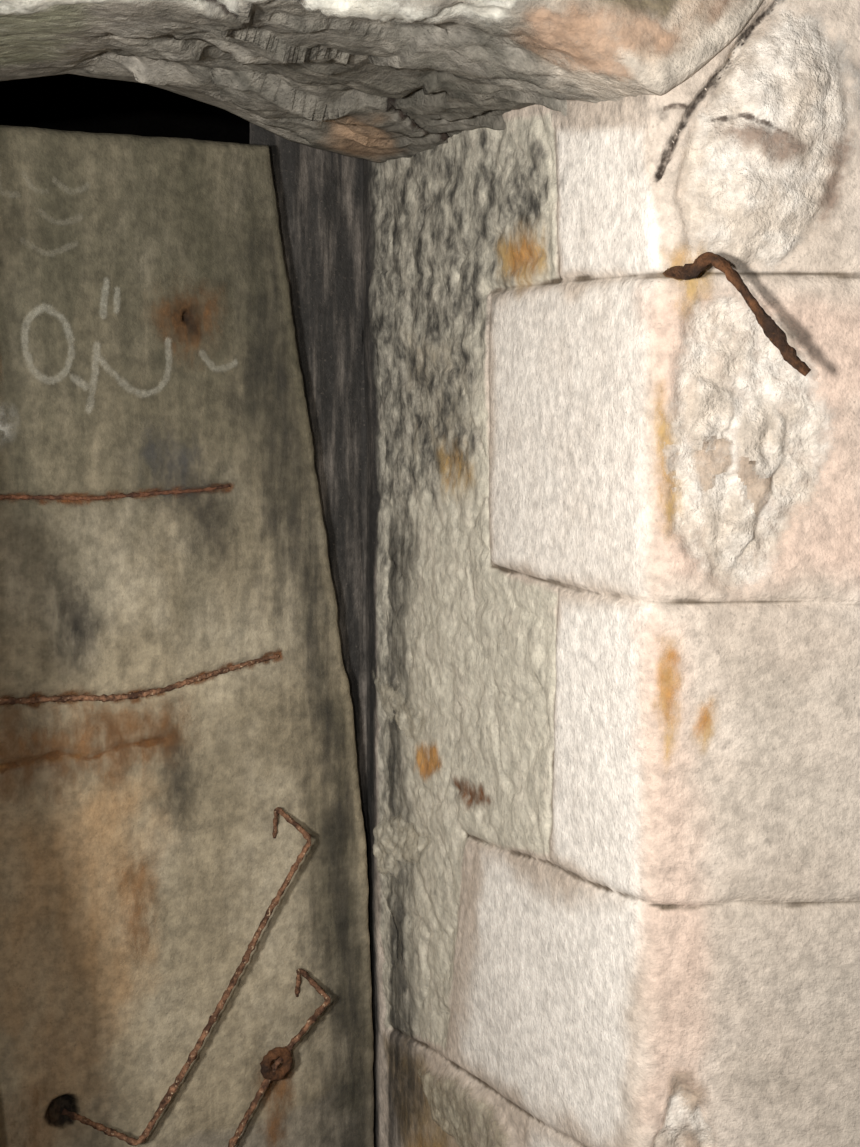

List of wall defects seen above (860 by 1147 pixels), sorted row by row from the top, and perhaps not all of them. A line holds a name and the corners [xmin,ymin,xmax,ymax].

crack [655,0,793,180]
corrosion [685,277,700,298]
corrosion [189,651,282,684]
corrosion [660,653,675,752]